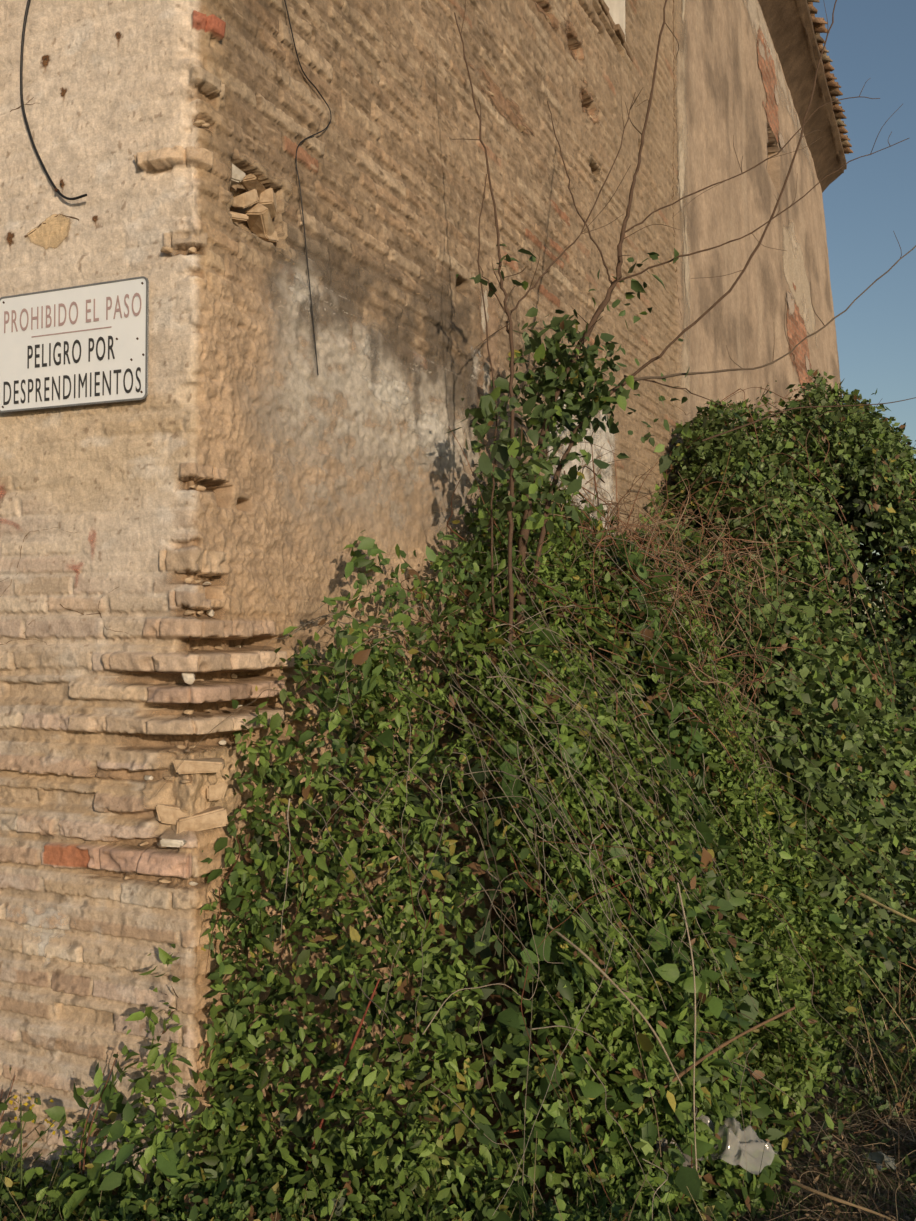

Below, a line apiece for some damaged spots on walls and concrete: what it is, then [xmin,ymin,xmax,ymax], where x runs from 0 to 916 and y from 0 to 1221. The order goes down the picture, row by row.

peeling [744,0,809,160]
peeling [24,214,79,249]
leakage [297,248,397,323]
peeling [227,155,500,505]
leakage [372,286,483,429]
peeling [676,39,690,394]
peeling [782,222,817,391]